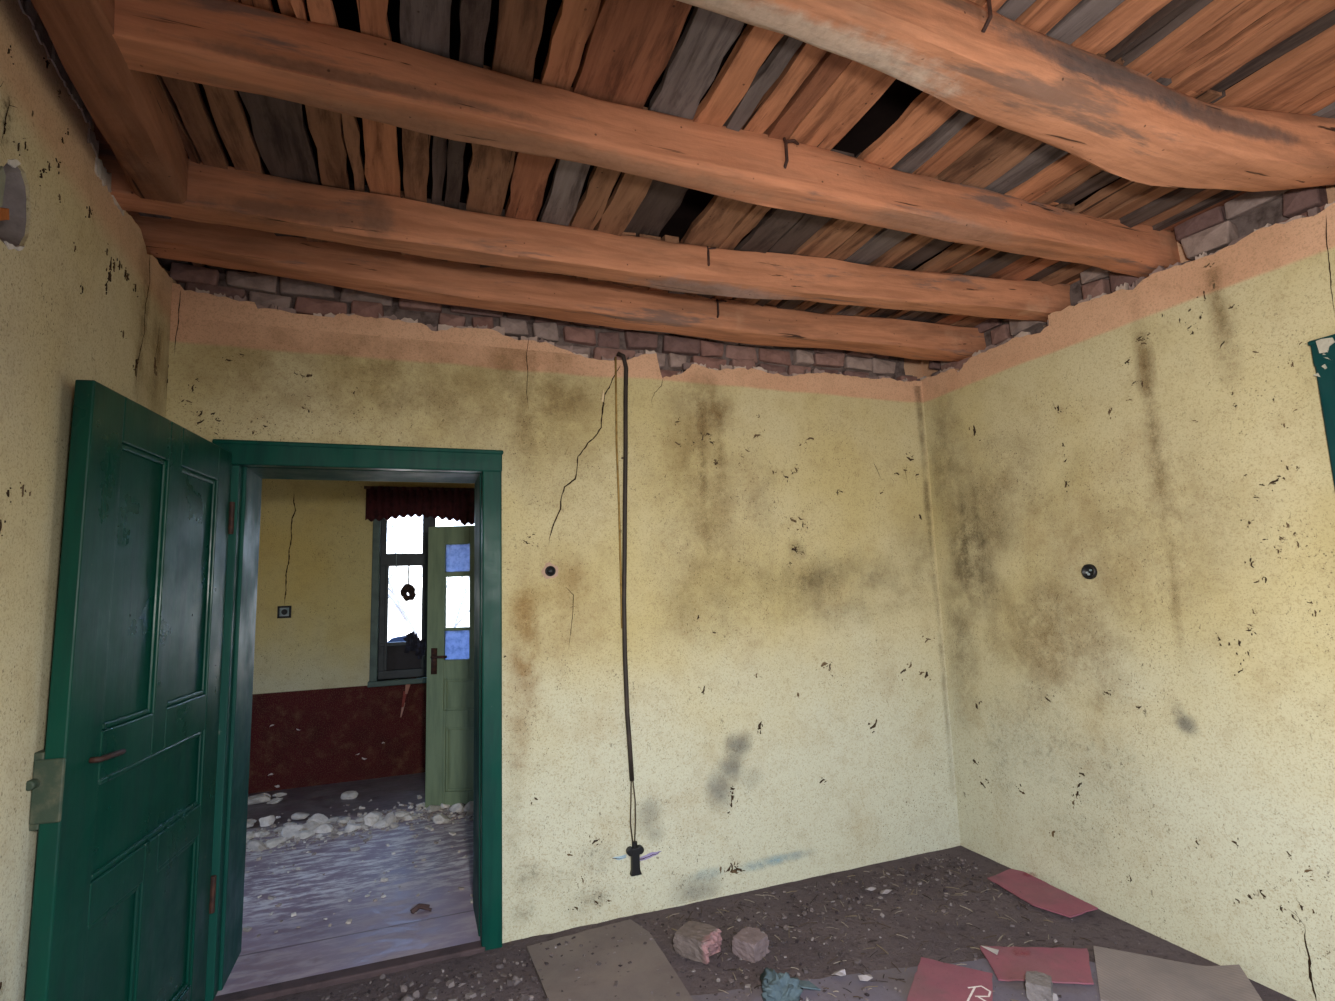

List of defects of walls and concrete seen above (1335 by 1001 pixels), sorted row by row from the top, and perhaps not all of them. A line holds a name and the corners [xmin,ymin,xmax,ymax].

flaking render [18,0,125,216]
flaking render [0,123,61,251]
peeling [105,243,138,297]
flaking render [169,262,1049,382]
flaking render [1070,185,1335,335]
peeling [1299,338,1335,377]
crack [1326,219,1335,315]
crack [549,365,621,539]